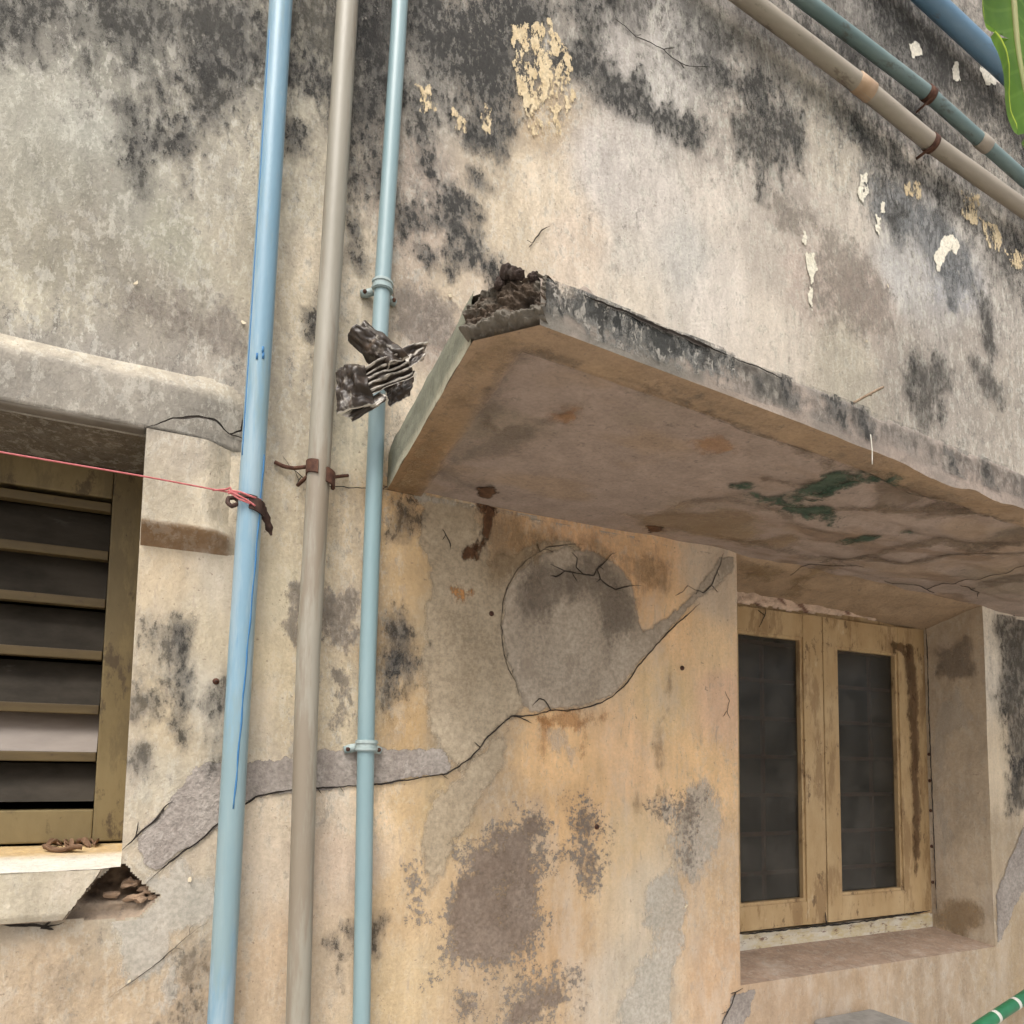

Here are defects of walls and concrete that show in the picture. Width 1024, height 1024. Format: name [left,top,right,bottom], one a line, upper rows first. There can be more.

damp [0,0,268,199]
damp [347,0,392,274]
peeling [511,17,576,138]
spalling [392,262,556,347]
damp [851,111,1024,411]
peeling [934,234,960,272]
crack [146,415,243,438]
rust [462,487,497,561]
crack [245,544,724,805]
crack [122,802,171,850]
peeling [65,860,215,1004]
damp [400,789,615,1024]